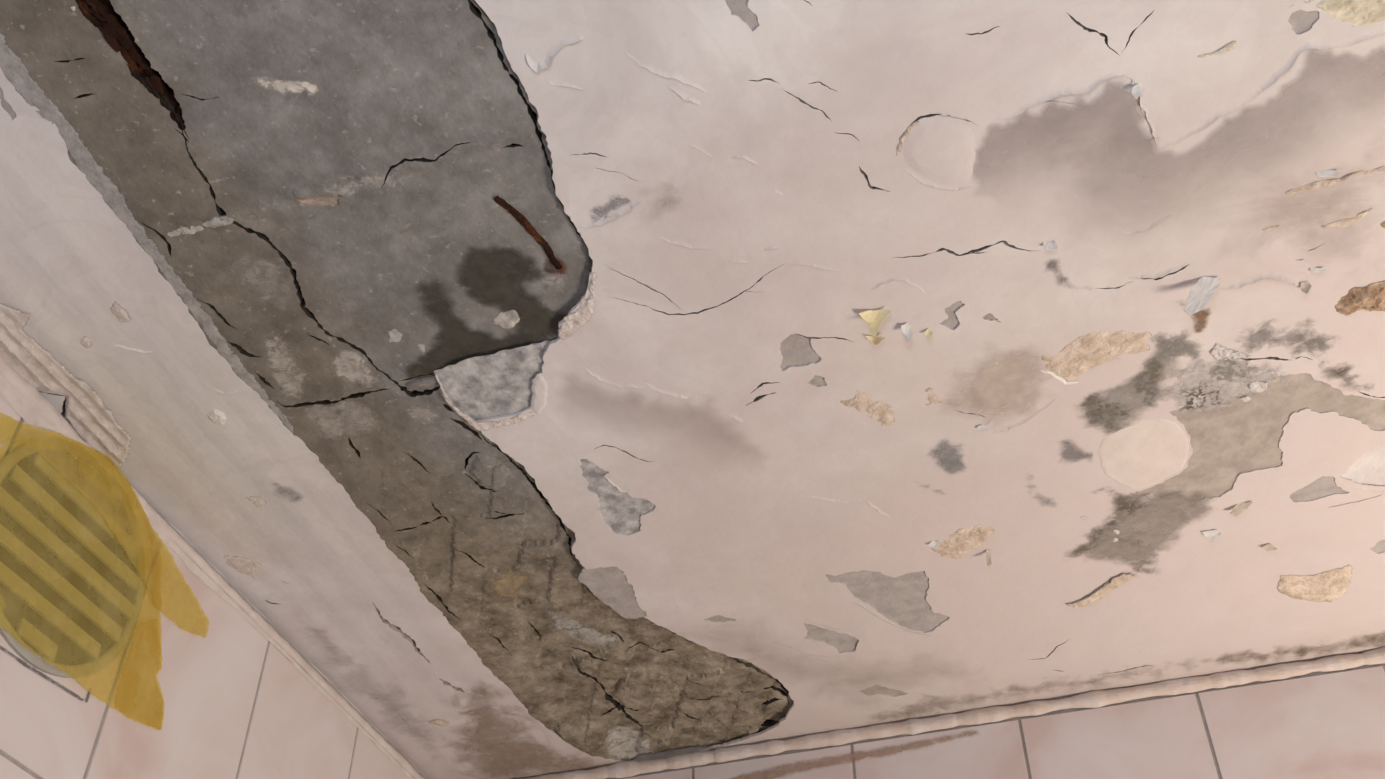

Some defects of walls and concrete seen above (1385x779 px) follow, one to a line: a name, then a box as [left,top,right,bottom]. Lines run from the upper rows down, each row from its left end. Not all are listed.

crack [1067,10,1154,55]
crack [381,0,784,315]
crack [125,63,580,568]
spalling [0,0,794,761]
water stain [408,248,567,379]
peeling [858,301,964,345]
water stain [1083,336,1280,432]
water stain [1248,329,1324,353]
flaking render [1335,281,1385,316]
water stain [1074,493,1206,566]
crack [367,451,789,738]
peeling [826,570,949,636]